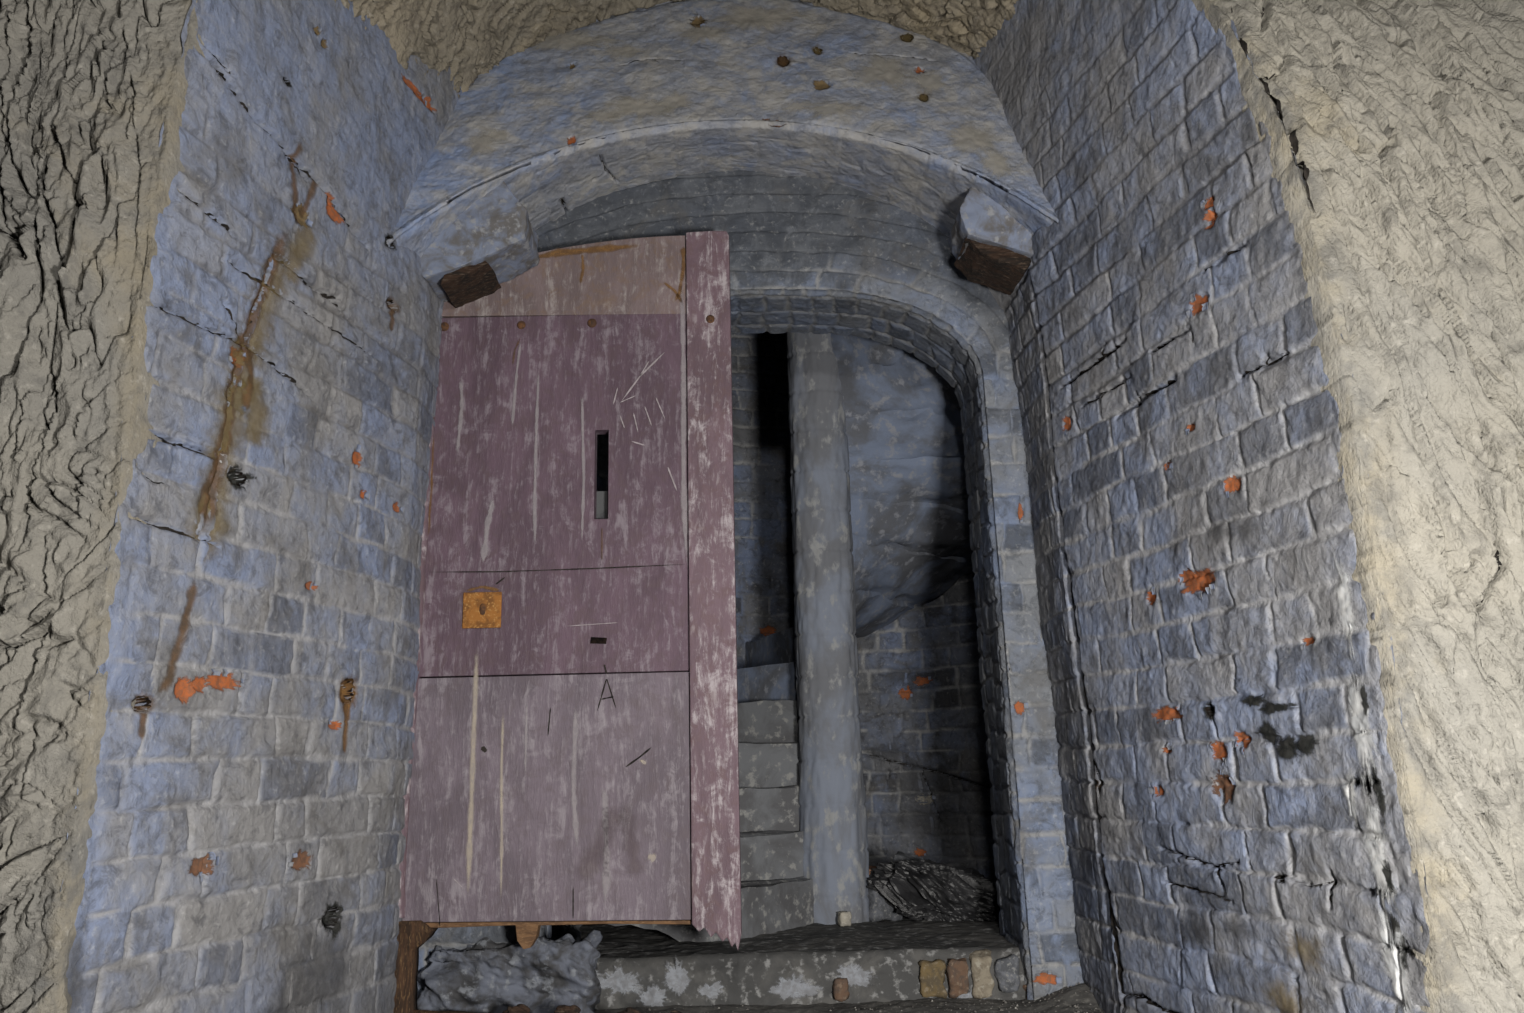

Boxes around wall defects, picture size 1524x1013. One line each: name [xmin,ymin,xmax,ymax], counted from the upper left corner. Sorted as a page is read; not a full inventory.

crack [1231,7,1316,213]
crack [0,229,26,260]
corrosion [193,144,317,542]
crack [1245,353,1289,375]
corrosion [160,586,196,690]
damp [1242,694,1319,764]